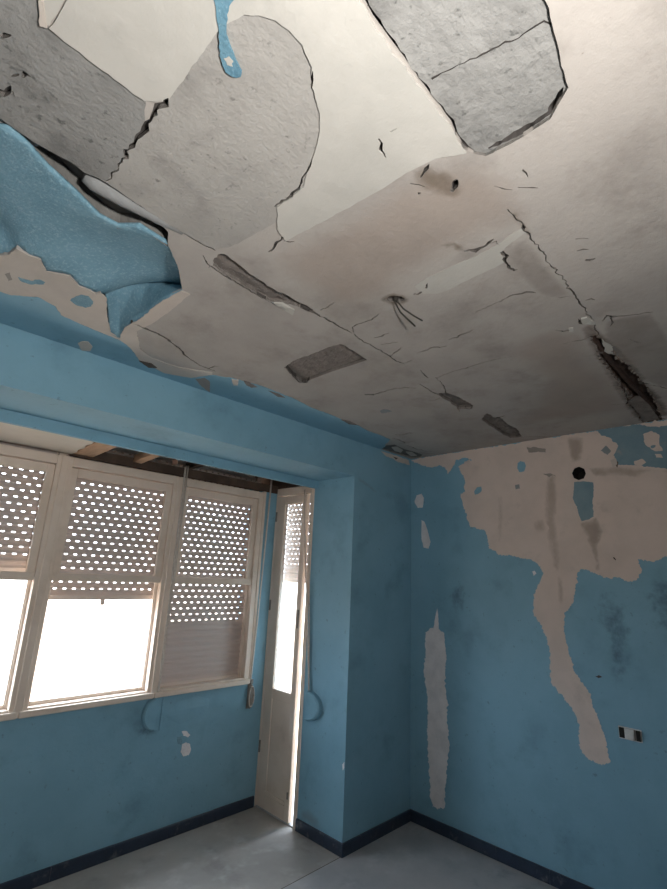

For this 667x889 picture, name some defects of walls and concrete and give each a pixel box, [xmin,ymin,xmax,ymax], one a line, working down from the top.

crack [106,98,169,181]
crack [274,160,312,207]
flaking render [0,0,472,465]
flaking render [414,228,524,294]
crack [513,214,651,333]
flaking render [602,312,667,388]
spalling [482,414,521,438]
peeling [640,420,667,458]
peeling [411,431,667,765]
peeling [177,731,191,757]
peeling [423,610,450,809]